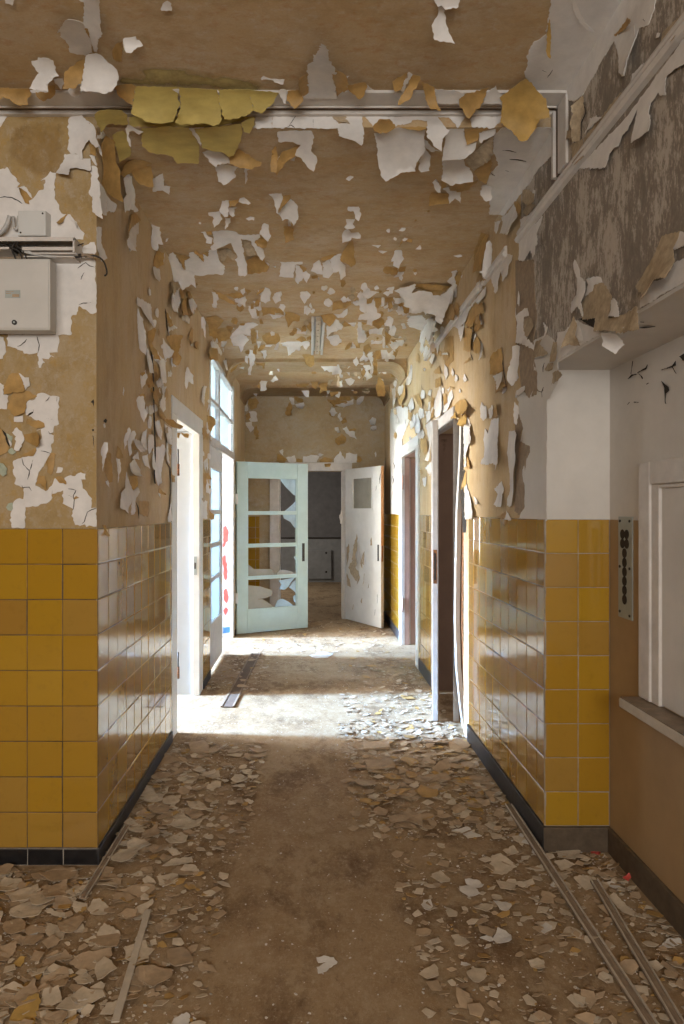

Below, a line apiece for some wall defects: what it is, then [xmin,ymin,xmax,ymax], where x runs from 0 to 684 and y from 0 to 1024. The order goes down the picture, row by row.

peeling [0,0,684,633]
crack [627,361,676,405]